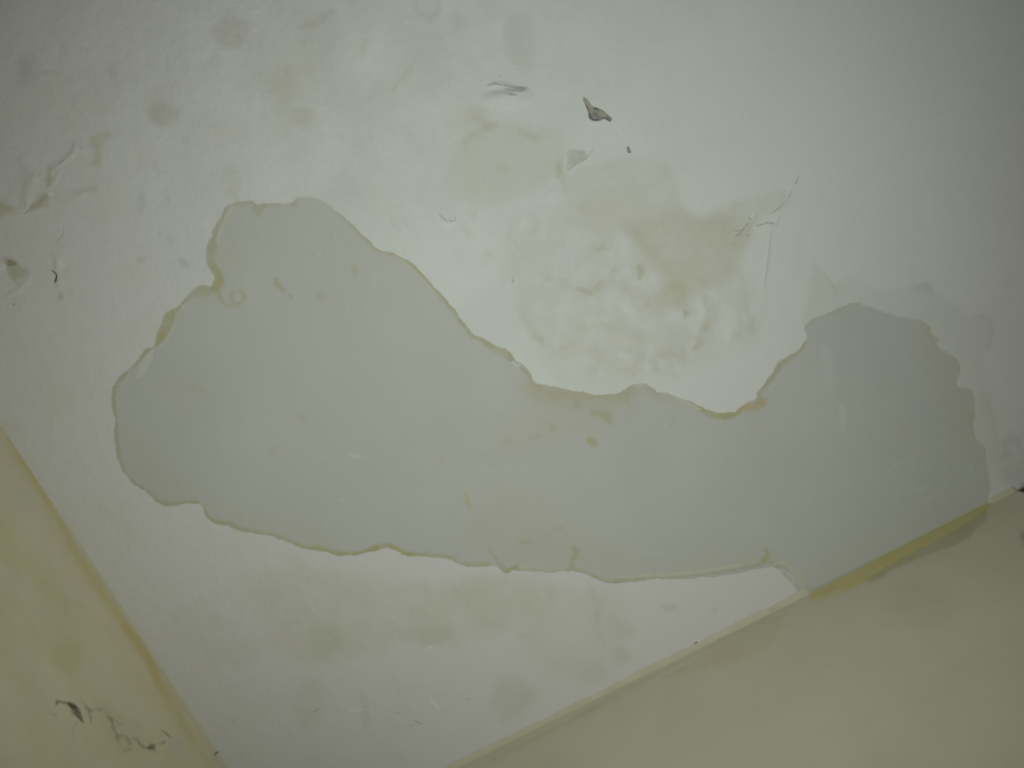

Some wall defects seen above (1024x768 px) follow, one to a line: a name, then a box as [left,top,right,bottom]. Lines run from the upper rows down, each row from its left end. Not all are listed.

peeling [112,197,991,591]
water stain [436,97,795,451]